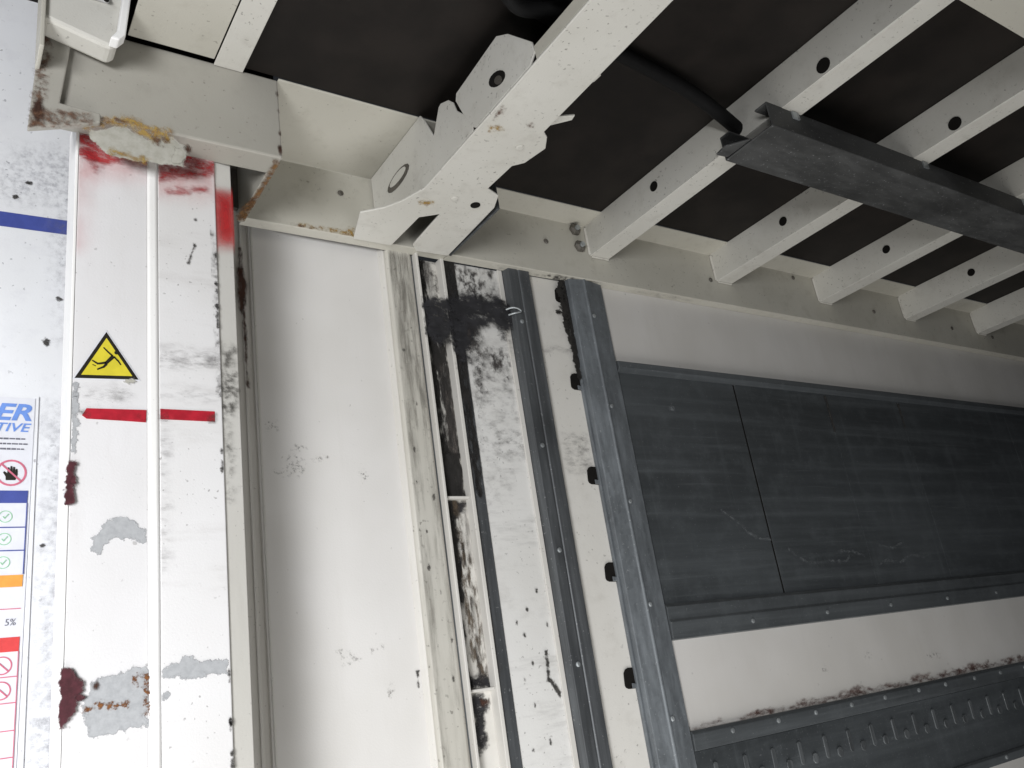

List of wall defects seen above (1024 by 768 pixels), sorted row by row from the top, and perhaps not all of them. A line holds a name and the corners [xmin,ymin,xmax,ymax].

corrosion [29,37,172,145]
peeling [89,126,191,167]
corrosion [236,132,282,221]
damp [418,259,513,393]
peeling [63,382,81,505]
damp [431,361,466,496]
peeling [90,517,146,555]
peeling [58,656,230,739]